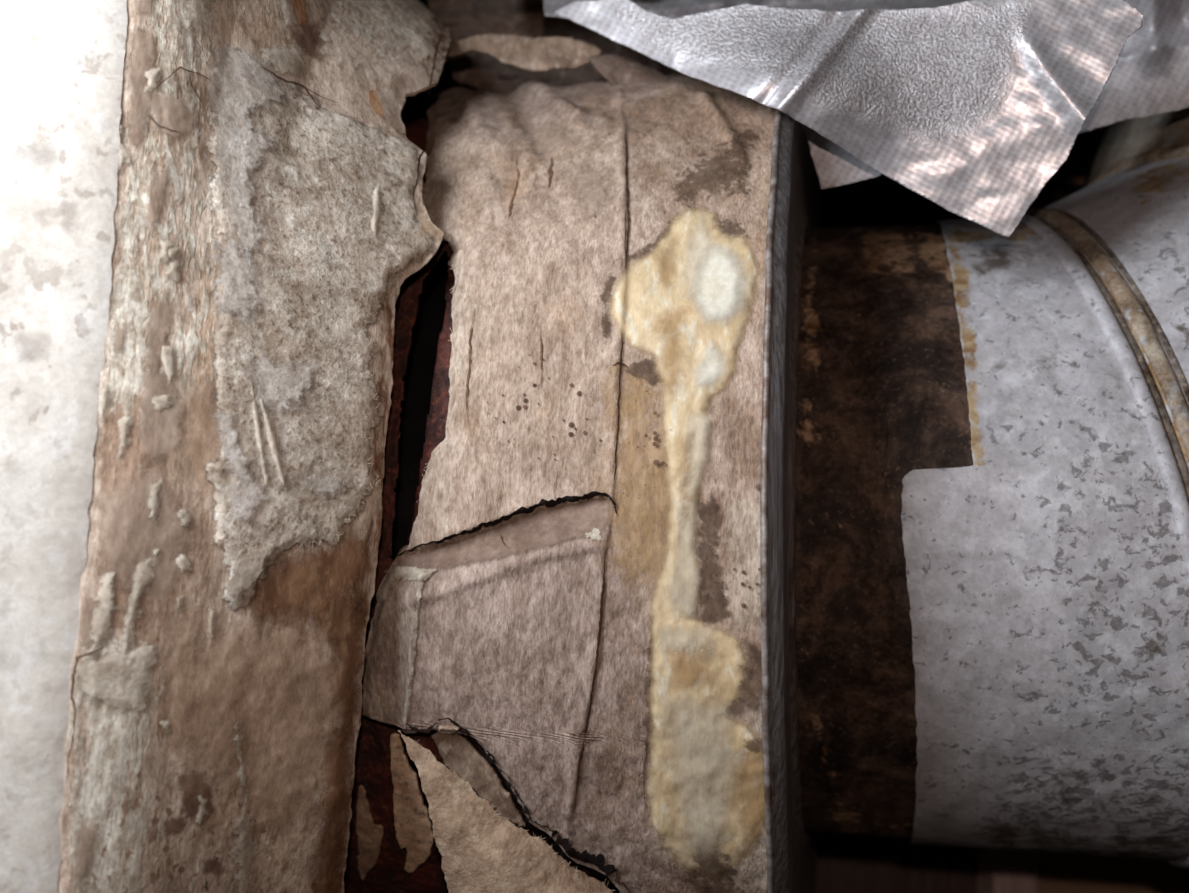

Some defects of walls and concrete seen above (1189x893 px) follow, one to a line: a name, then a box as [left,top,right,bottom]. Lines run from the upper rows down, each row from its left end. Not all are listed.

peeling [143,68,163,94]
crack [623,135,631,264]
peeling [99,381,134,458]
peeling [151,346,176,411]
flaking render [205,43,436,639]
peeling [77,549,162,713]
peeling [146,479,163,524]
peeling [175,553,193,573]
crack [398,333,629,893]
crack [643,614,653,810]
leakage [600,124,765,893]
peeling [398,730,614,893]